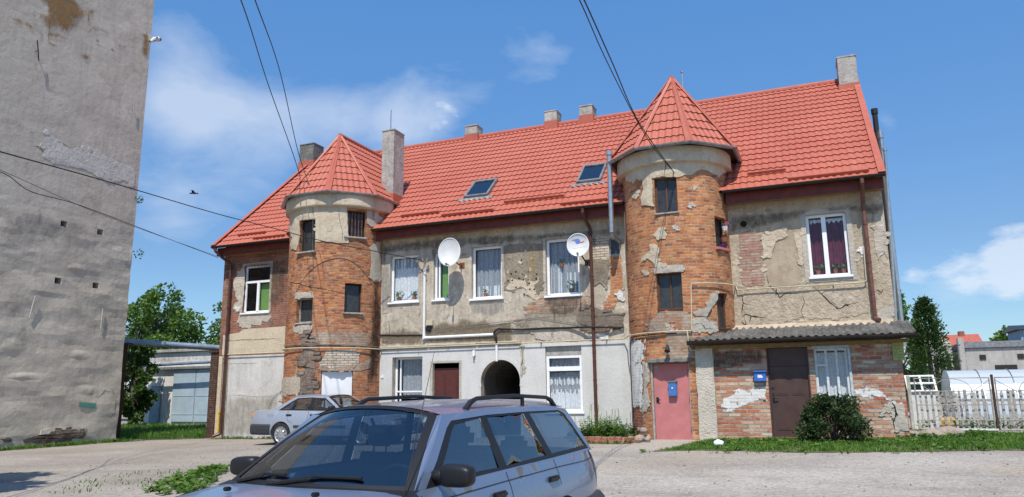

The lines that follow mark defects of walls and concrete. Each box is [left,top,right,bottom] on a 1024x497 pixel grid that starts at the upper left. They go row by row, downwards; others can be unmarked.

spalling [40,130,135,187]
peeling [233,269,272,327]
peeling [641,224,685,276]
spalling [737,226,806,325]
crack [766,274,853,320]
peeling [503,237,720,431]
spalling [278,324,389,402]
spalling [0,426,87,444]
peeling [721,386,767,414]
spalling [854,386,909,432]